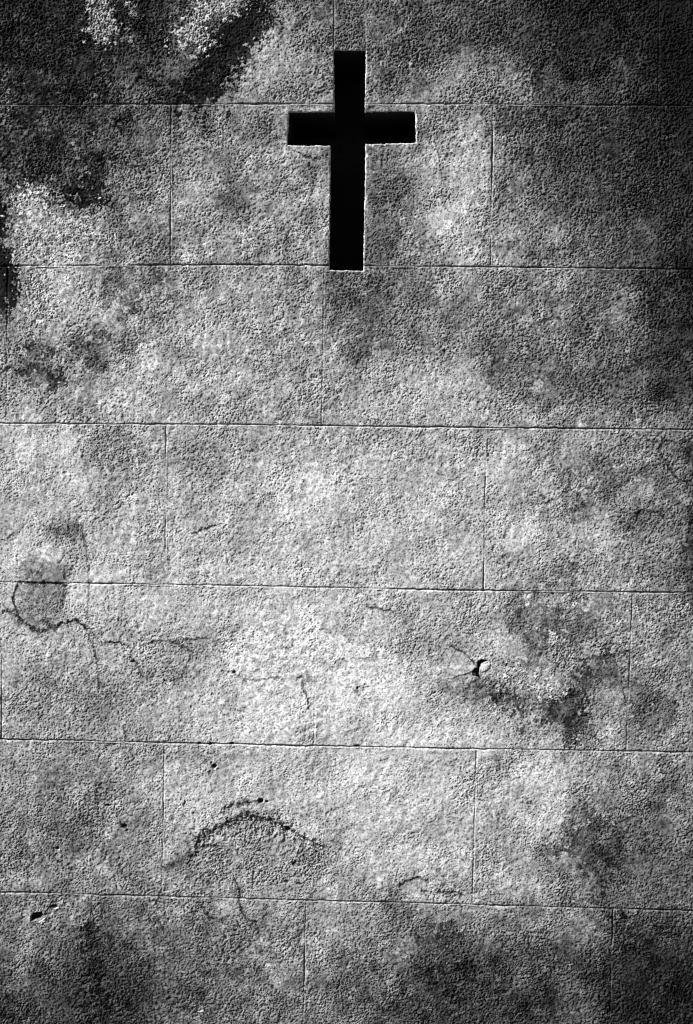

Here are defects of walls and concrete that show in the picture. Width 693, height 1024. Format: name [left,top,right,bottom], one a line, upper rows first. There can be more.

crack [0,525,214,688]
spalling [451,646,491,689]